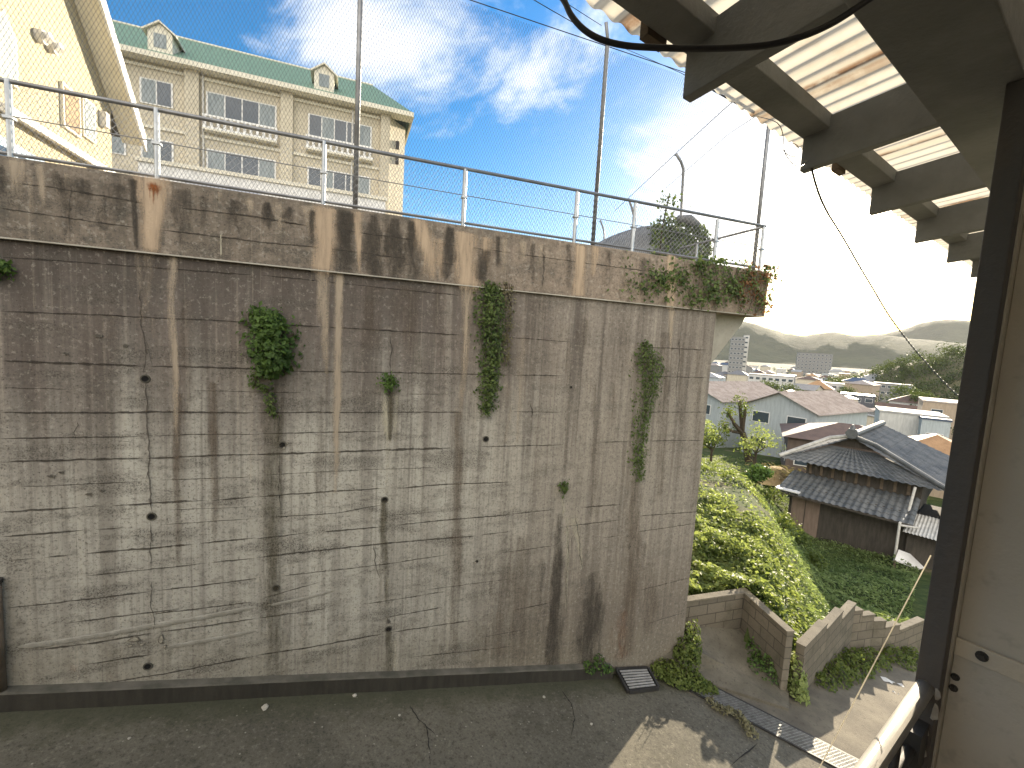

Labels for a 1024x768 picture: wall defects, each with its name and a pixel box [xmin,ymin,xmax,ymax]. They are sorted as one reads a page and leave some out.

water stain [0,160,57,200]
water stain [103,176,166,251]
water stain [354,212,362,265]
water stain [169,257,180,486]
water stain [276,205,343,467]
crack [139,293,155,629]
crack [410,706,435,764]